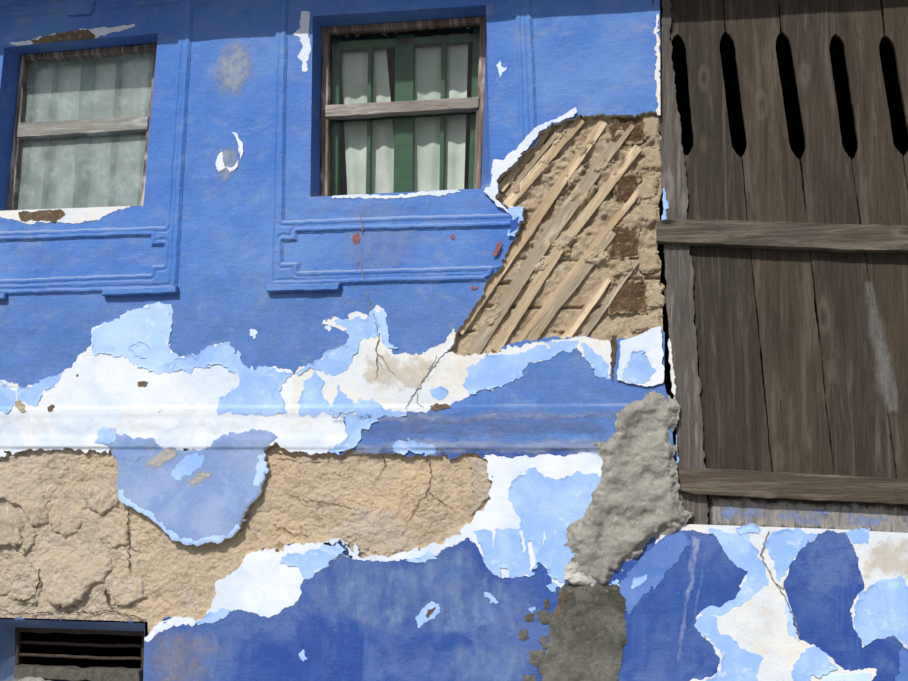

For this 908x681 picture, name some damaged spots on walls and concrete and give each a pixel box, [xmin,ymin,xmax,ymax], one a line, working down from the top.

flaking render [0,0,676,642]
crack [355,217,395,378]
crack [406,349,449,407]
crack [5,569,145,621]
crack [126,508,145,575]
crack [286,493,357,510]
peeling [609,505,908,681]
crack [760,532,800,641]